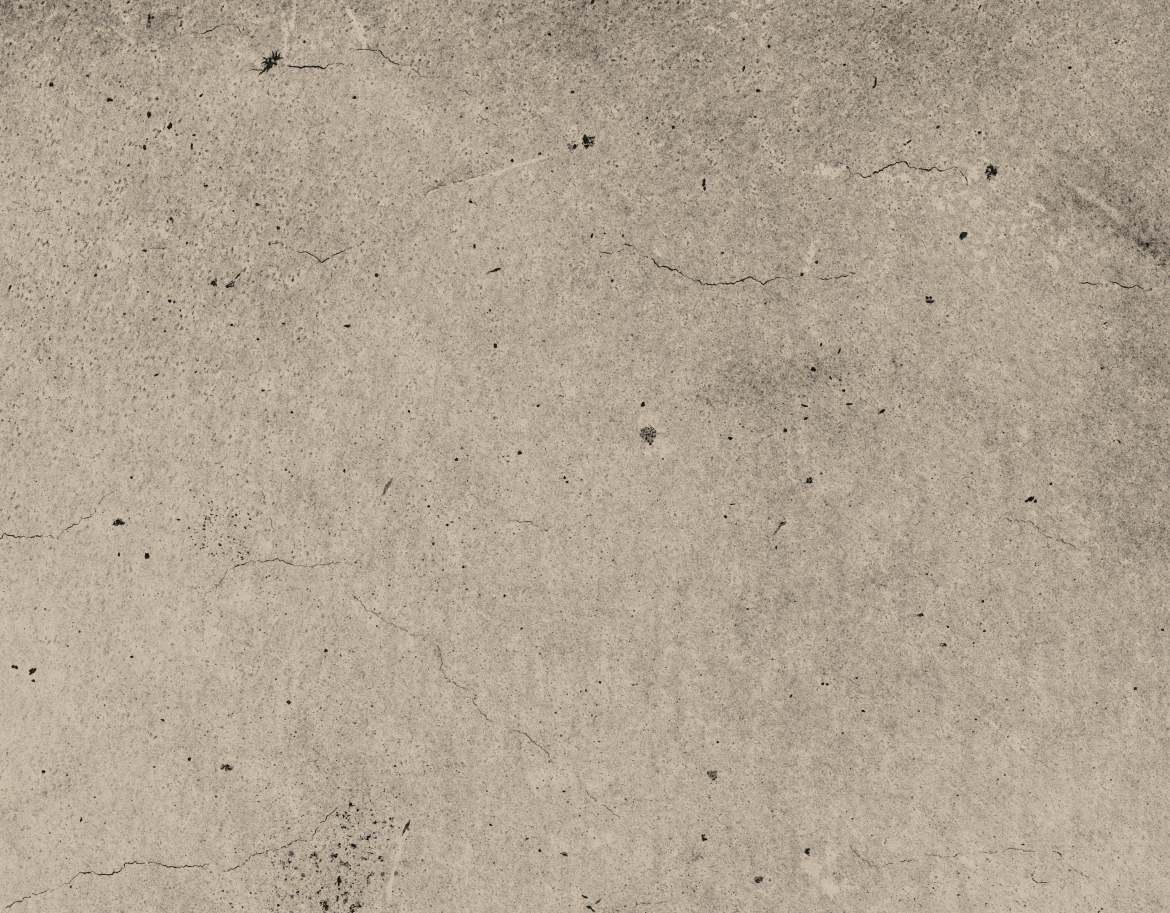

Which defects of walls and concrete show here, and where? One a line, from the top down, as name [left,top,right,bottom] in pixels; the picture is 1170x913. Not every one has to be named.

crack [841,161,968,184]
crack [602,243,852,285]
crack [0,491,114,539]
crack [6,807,338,908]